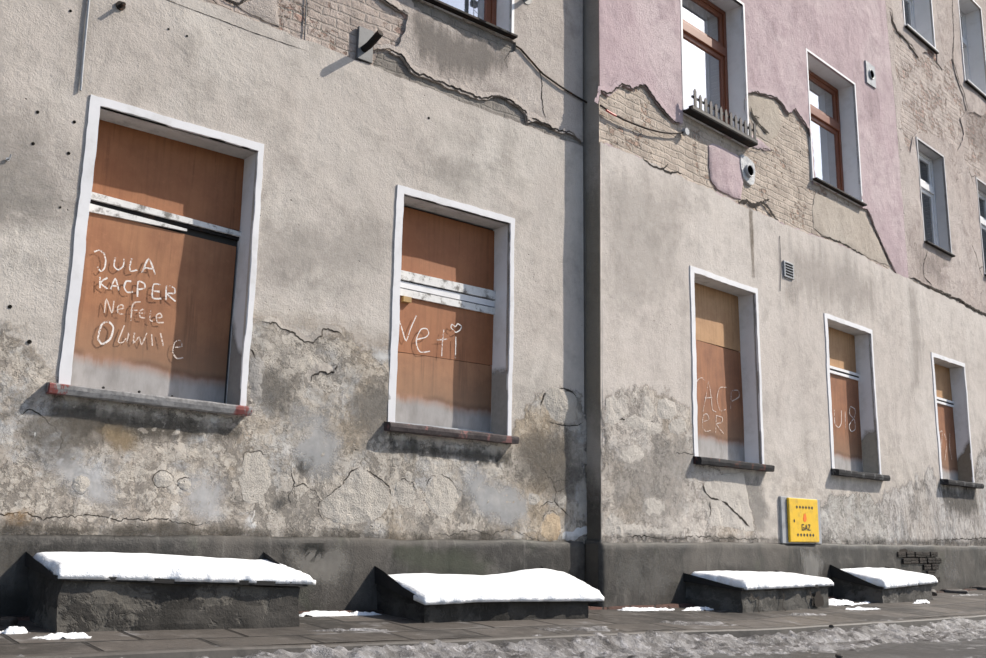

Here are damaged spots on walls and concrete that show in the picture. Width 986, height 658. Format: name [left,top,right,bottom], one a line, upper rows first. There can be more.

spalling [200,0,583,146]
damp [415,15,503,74]
crack [374,44,582,140]
spalling [596,82,895,273]
crack [259,316,348,381]
crack [821,212,986,314]
spalling [909,278,986,317]
damp [109,522,259,536]
peeling [0,318,587,544]
damp [562,487,683,603]
peeling [601,384,758,543]
damp [943,442,977,516]